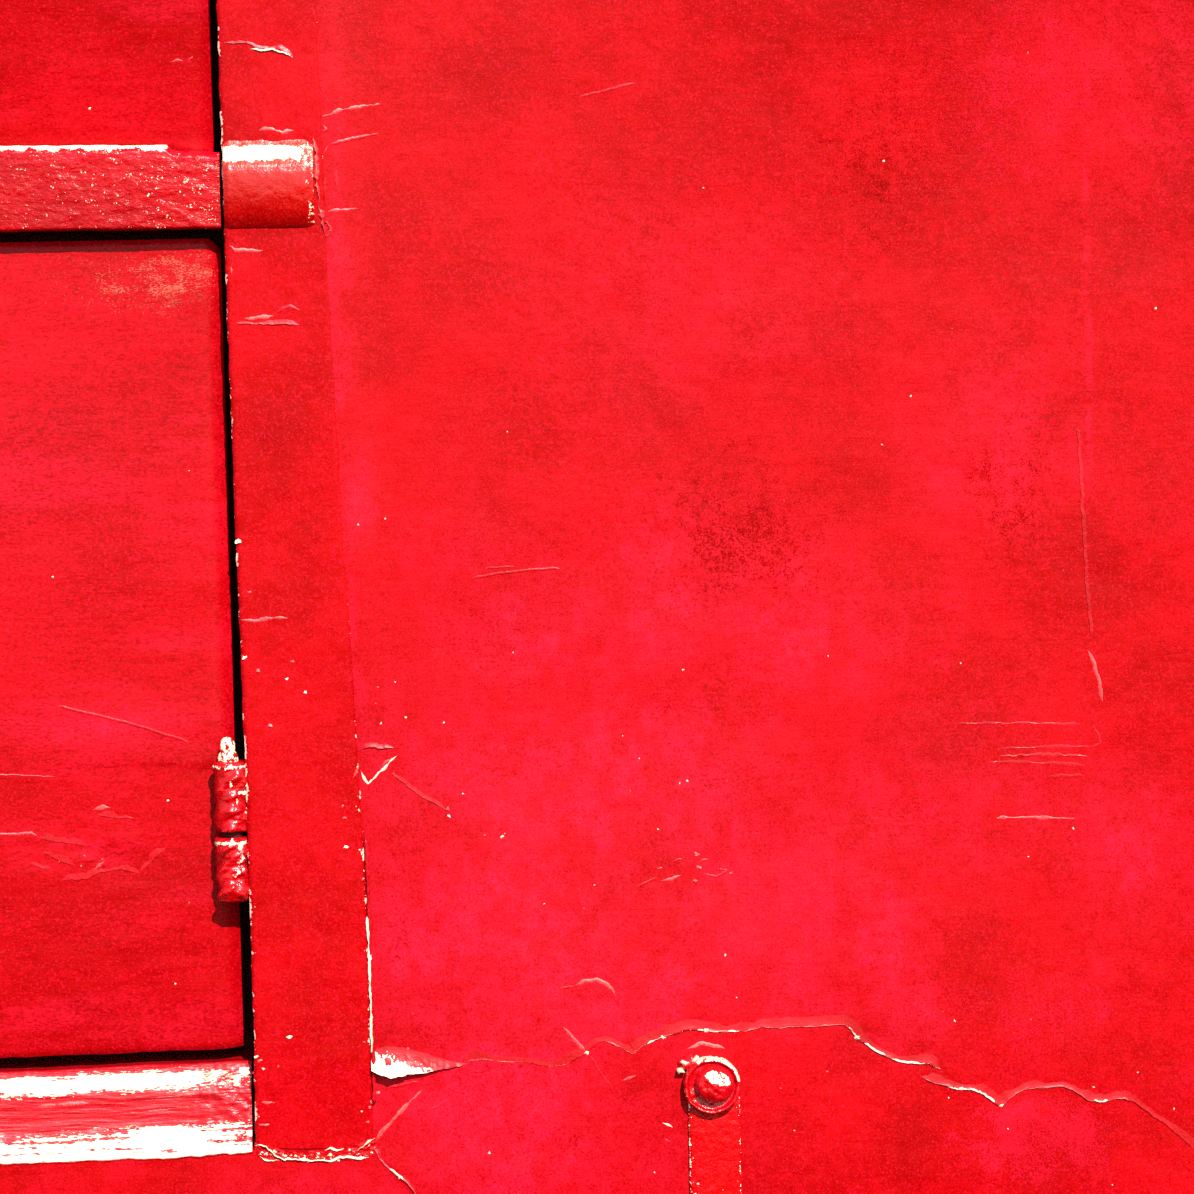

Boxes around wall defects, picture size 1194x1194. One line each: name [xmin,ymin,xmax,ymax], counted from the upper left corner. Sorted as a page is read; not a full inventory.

crack [364,835,421,1194]
peeling [0,1055,264,1100]
peeling [361,1041,469,1123]
crack [464,1015,1194,1149]
peeling [0,1120,378,1164]